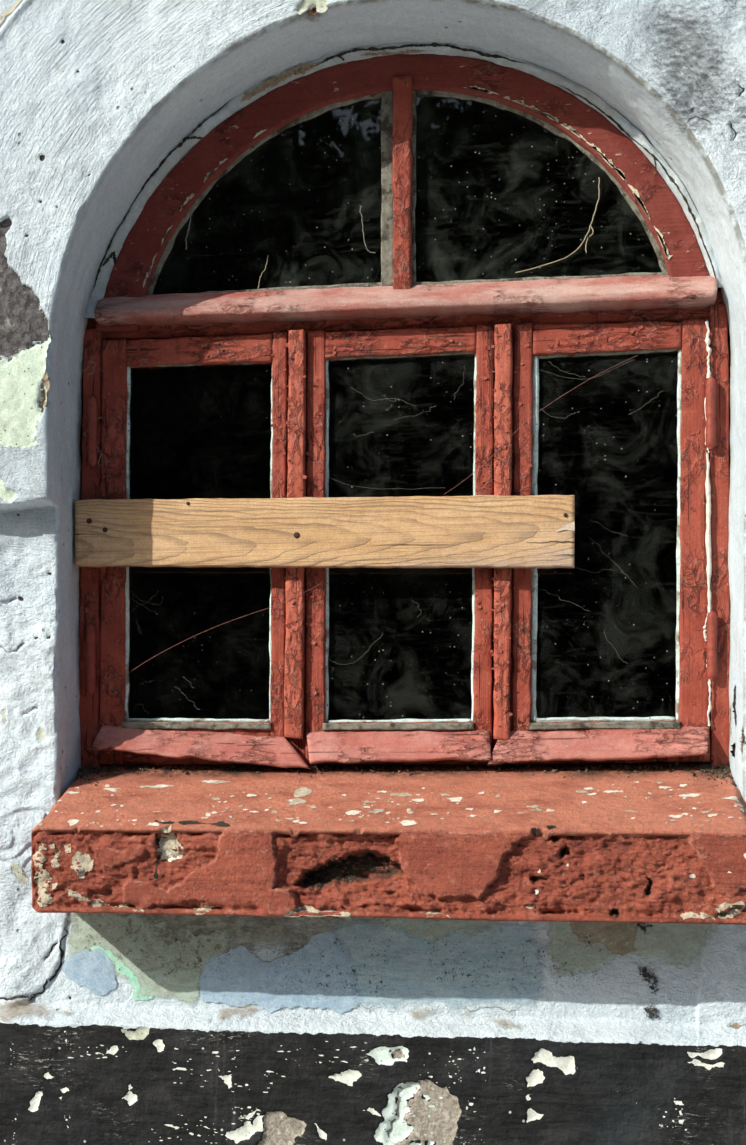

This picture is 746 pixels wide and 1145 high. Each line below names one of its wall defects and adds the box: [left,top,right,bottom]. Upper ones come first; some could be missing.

water stain [652,15,723,130]
crack [674,116,737,141]
flaking render [0,218,51,449]
peeling [11,843,144,912]
crack [0,920,68,1007]
peeling [27,1091,43,1112]
peeling [64,1027,177,1059]
peeling [149,1106,327,1145]
peeling [316,1041,409,1086]
peeling [363,1047,486,1145]
peeling [526,1048,576,1123]
peeling [687,1048,725,1070]